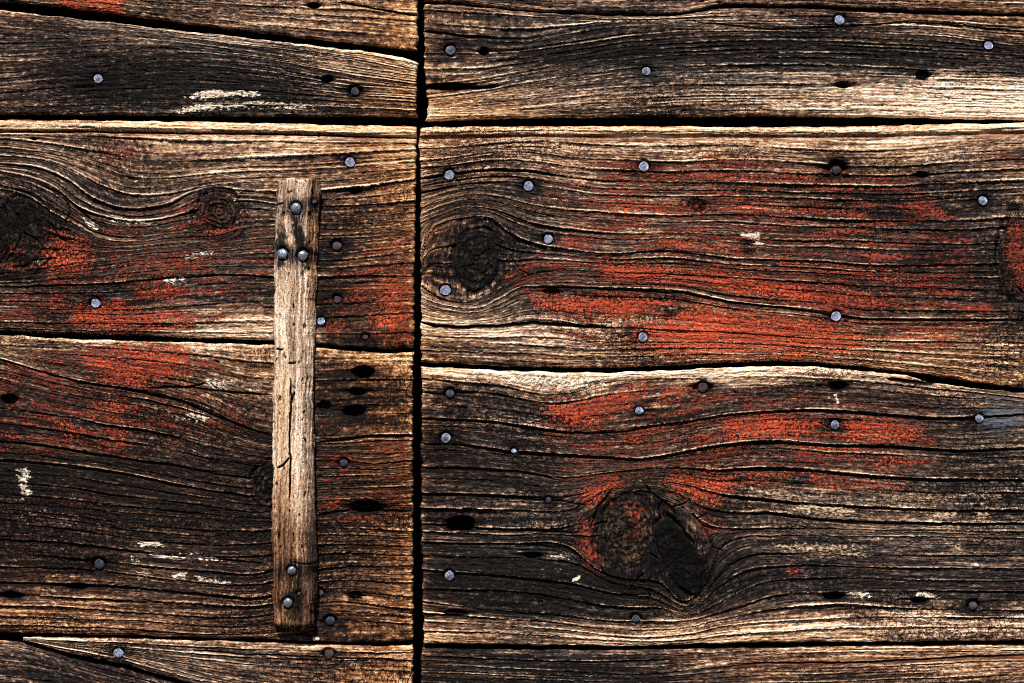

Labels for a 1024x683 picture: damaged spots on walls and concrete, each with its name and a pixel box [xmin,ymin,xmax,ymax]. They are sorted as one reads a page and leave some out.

peeling [0,193,274,500]
peeling [324,233,415,348]
peeling [501,154,996,365]
peeling [1002,221,1024,291]
crack [0,348,296,502]
peeling [318,432,411,526]
peeling [538,381,1001,582]